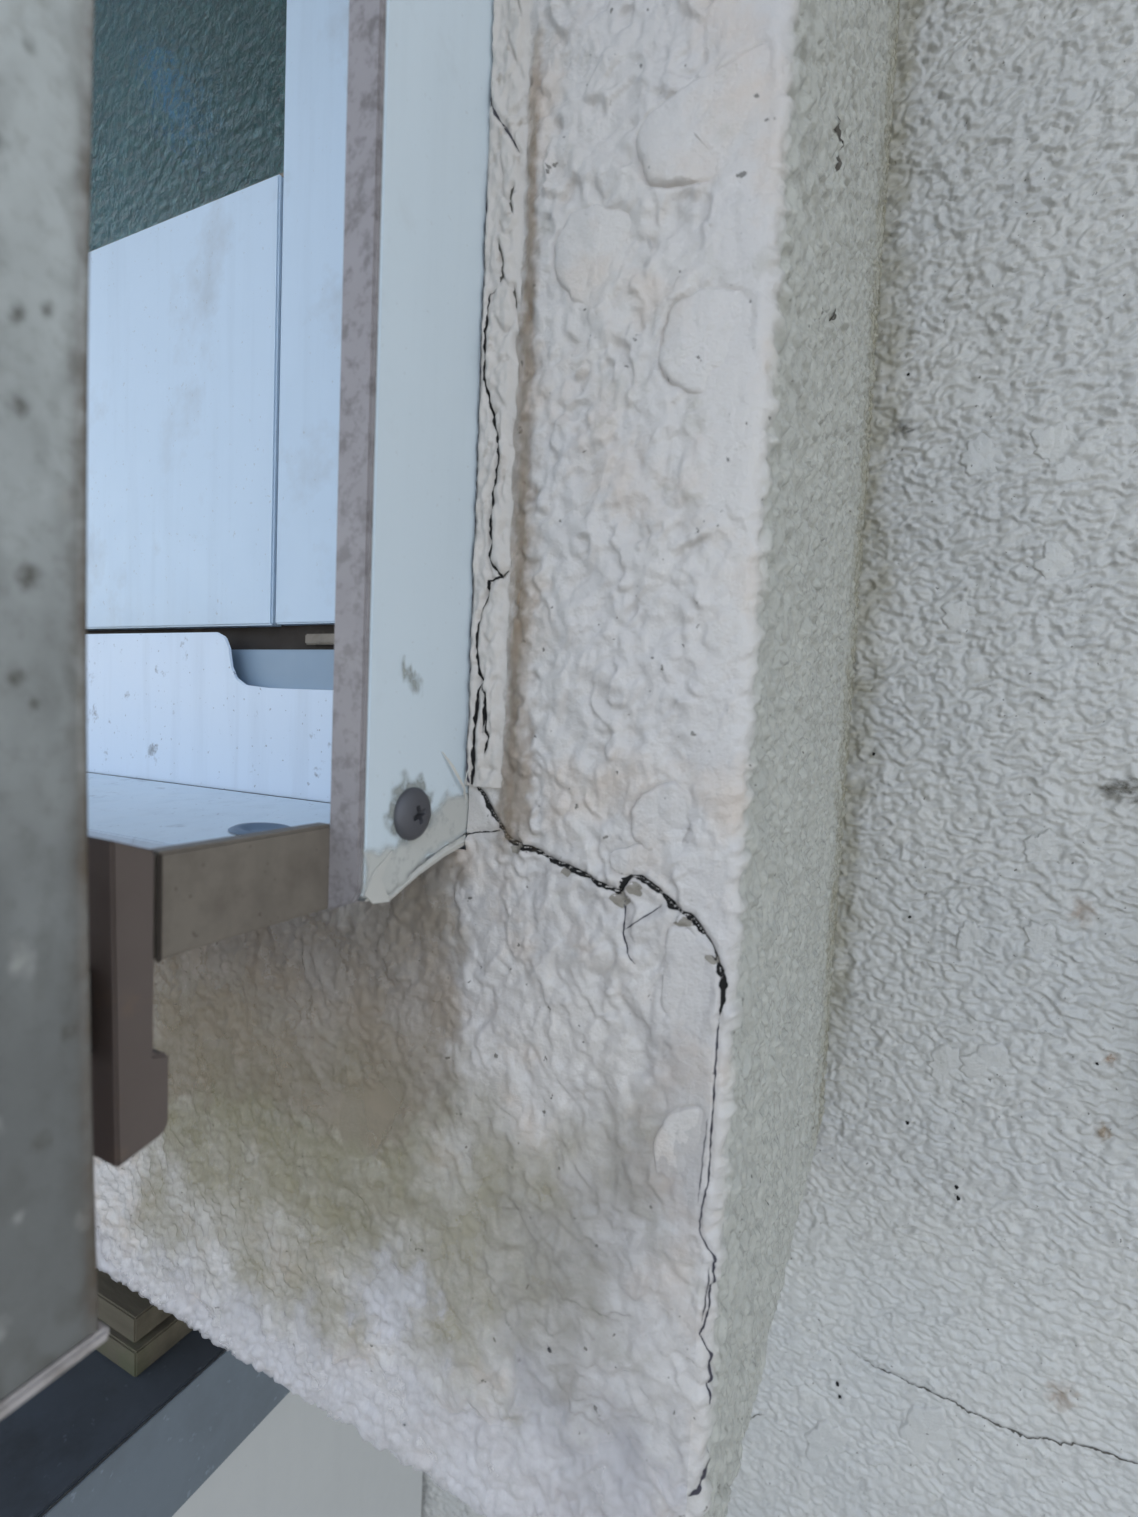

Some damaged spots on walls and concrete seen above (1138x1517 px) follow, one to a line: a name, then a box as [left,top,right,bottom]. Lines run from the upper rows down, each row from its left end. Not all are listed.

crack [462,97,728,1405]
crack [829,1341,1138,1464]
crack [689,1449,710,1496]